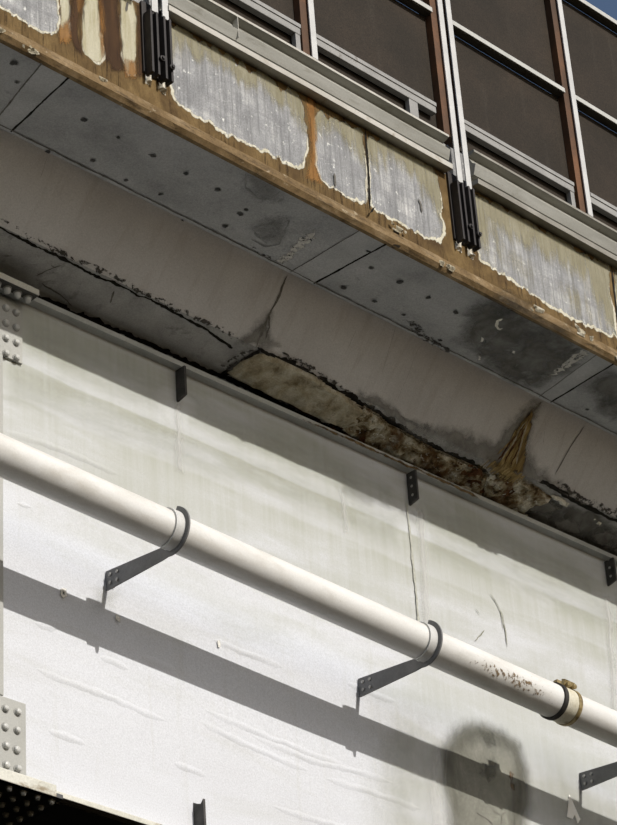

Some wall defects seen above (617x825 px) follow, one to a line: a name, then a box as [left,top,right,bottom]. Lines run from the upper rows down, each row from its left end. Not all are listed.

corrosion [0,0,617,350]
peeling [26,233,238,339]
crack [0,227,488,473]
spalling [402,314,450,352]
spalling [221,350,617,518]
crack [539,427,617,522]
crack [475,595,508,646]
corrosion [477,662,544,695]
water stain [438,726,528,825]